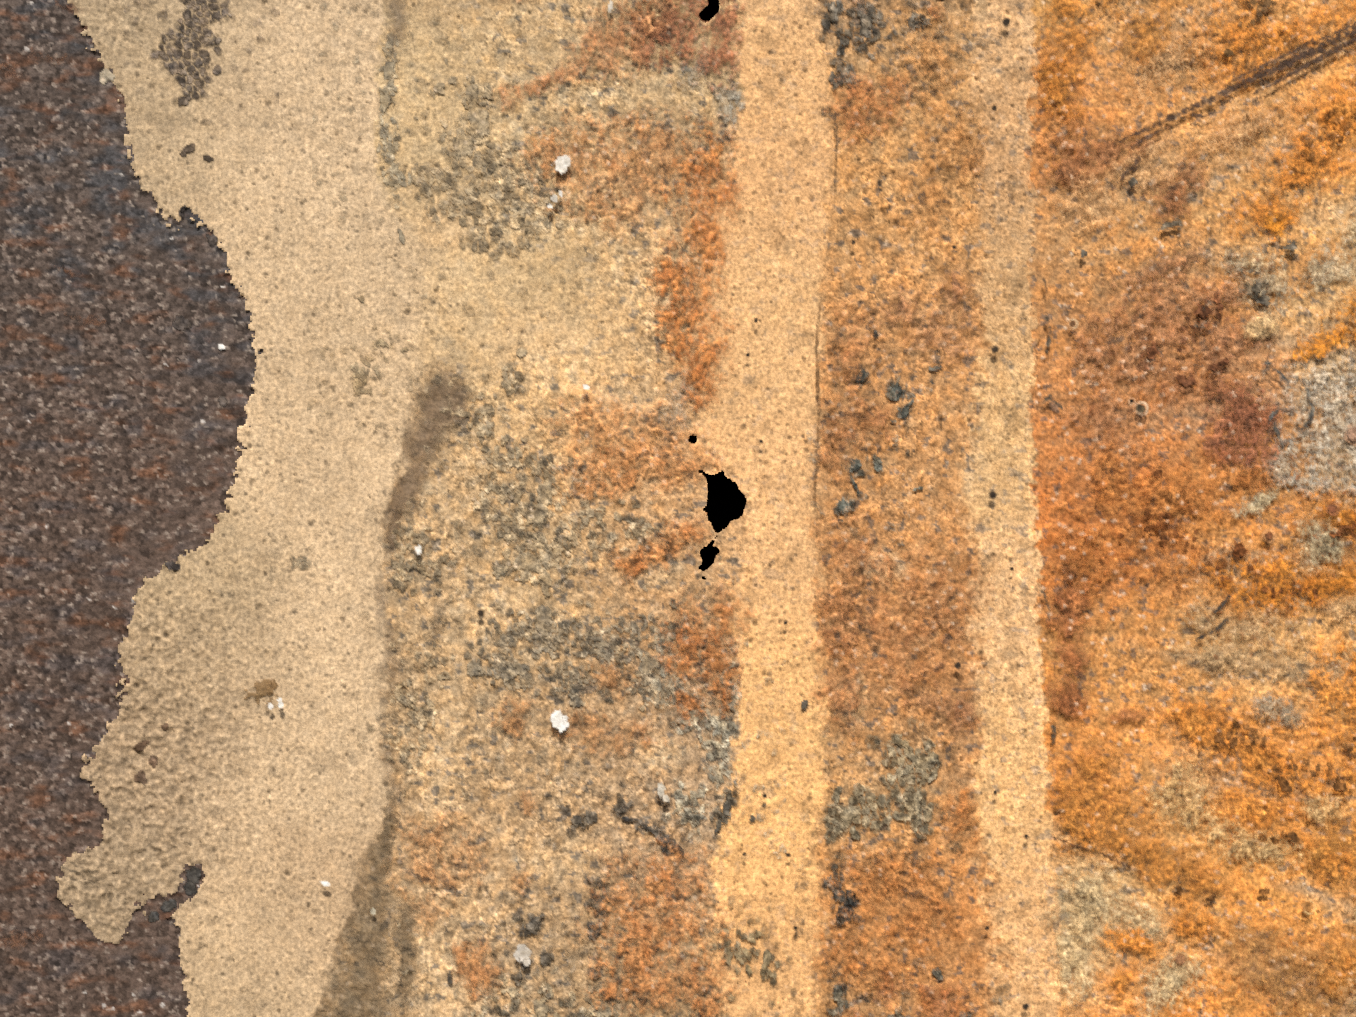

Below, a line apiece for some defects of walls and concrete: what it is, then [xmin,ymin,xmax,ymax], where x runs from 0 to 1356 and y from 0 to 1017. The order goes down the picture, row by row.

corrosion [499,0,745,111]
corrosion [1034,0,1356,190]
corrosion [1228,84,1356,241]
corrosion [524,111,741,409]
peeling [0,0,263,1017]
leakage [385,373,467,550]
corrosion [551,391,718,500]
corrosion [1044,248,1356,718]
corrosion [1109,638,1356,896]
corrosion [591,842,733,1017]
corrosion [814,851,969,1017]
corrosion [1050,748,1356,1017]